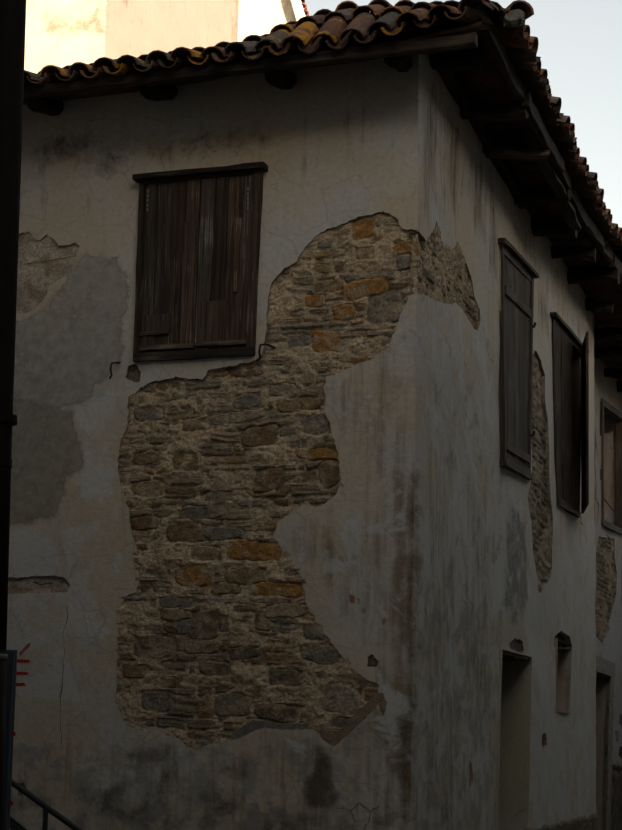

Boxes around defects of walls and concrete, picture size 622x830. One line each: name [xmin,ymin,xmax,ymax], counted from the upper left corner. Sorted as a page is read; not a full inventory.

flaking render [8,575,70,594]
peeling [10,232,128,524]
flaking render [114,211,480,751]
flaking render [528,351,553,592]
flaking render [595,535,617,645]
leakage [305,753,335,806]